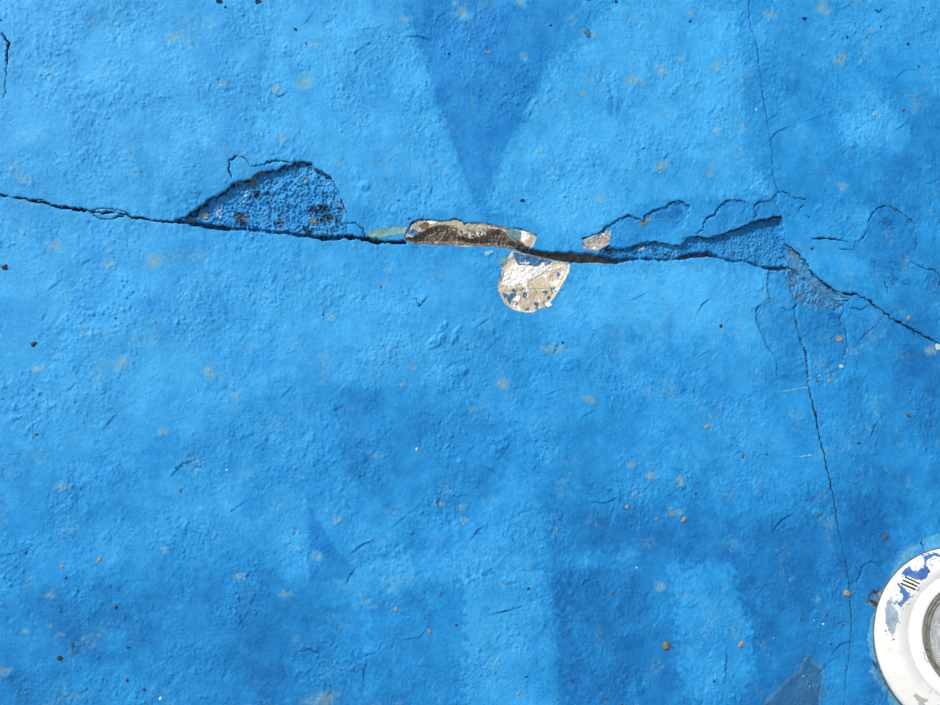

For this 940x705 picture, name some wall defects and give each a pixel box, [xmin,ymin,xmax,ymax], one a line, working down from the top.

crack [0,19,10,97]
crack [0,194,406,245]
spalling [177,156,570,313]
peeling [582,191,849,381]
crack [516,0,939,687]